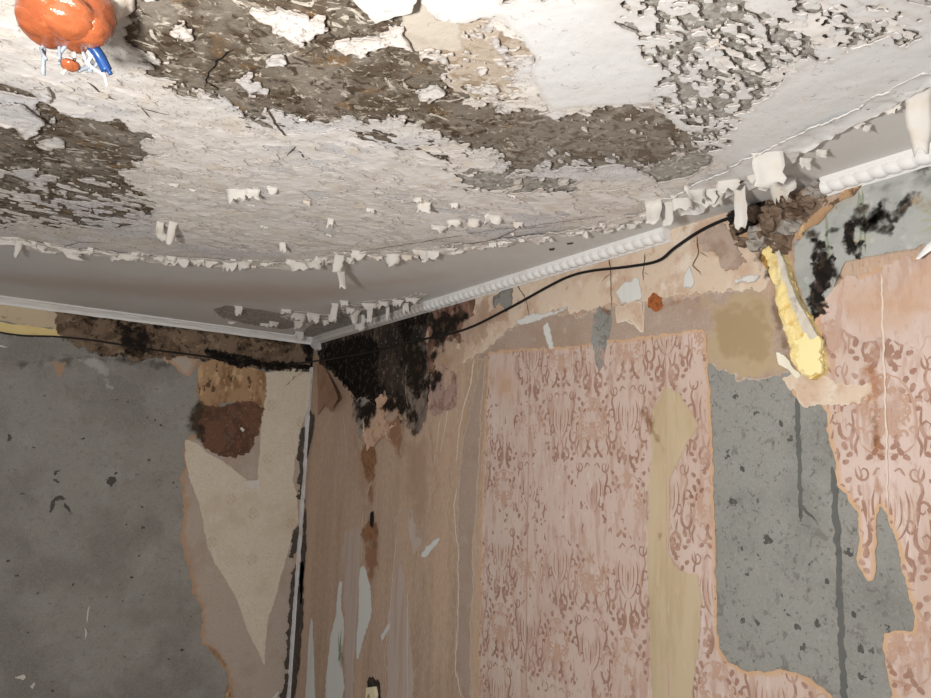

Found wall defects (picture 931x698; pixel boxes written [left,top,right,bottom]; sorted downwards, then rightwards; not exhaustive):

peeling [0,0,922,371]
peeling [885,87,931,158]
damp [805,194,931,350]
flaking render [187,400,265,459]
damp [9,295,509,539]
spalling [708,363,915,698]
spalling [367,676,381,698]